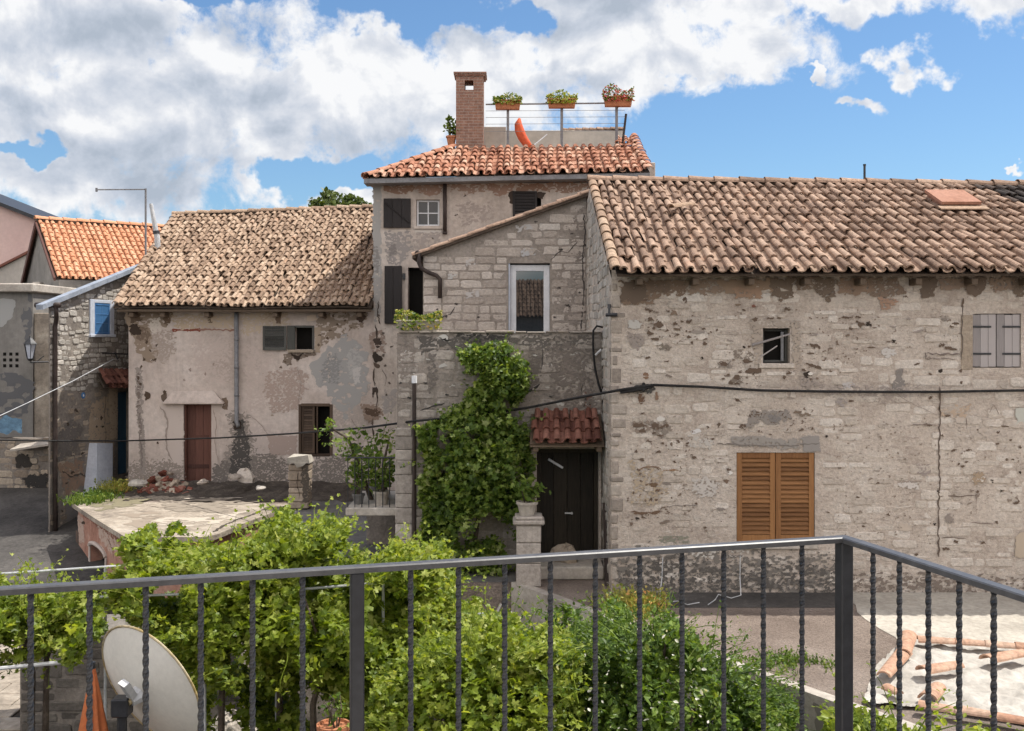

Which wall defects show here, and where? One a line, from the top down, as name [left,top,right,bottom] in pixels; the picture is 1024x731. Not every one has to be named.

flaking render [124,312,214,475]
leakage [209,410,292,483]
flaking render [365,332,402,417]
crack [881,384,995,557]